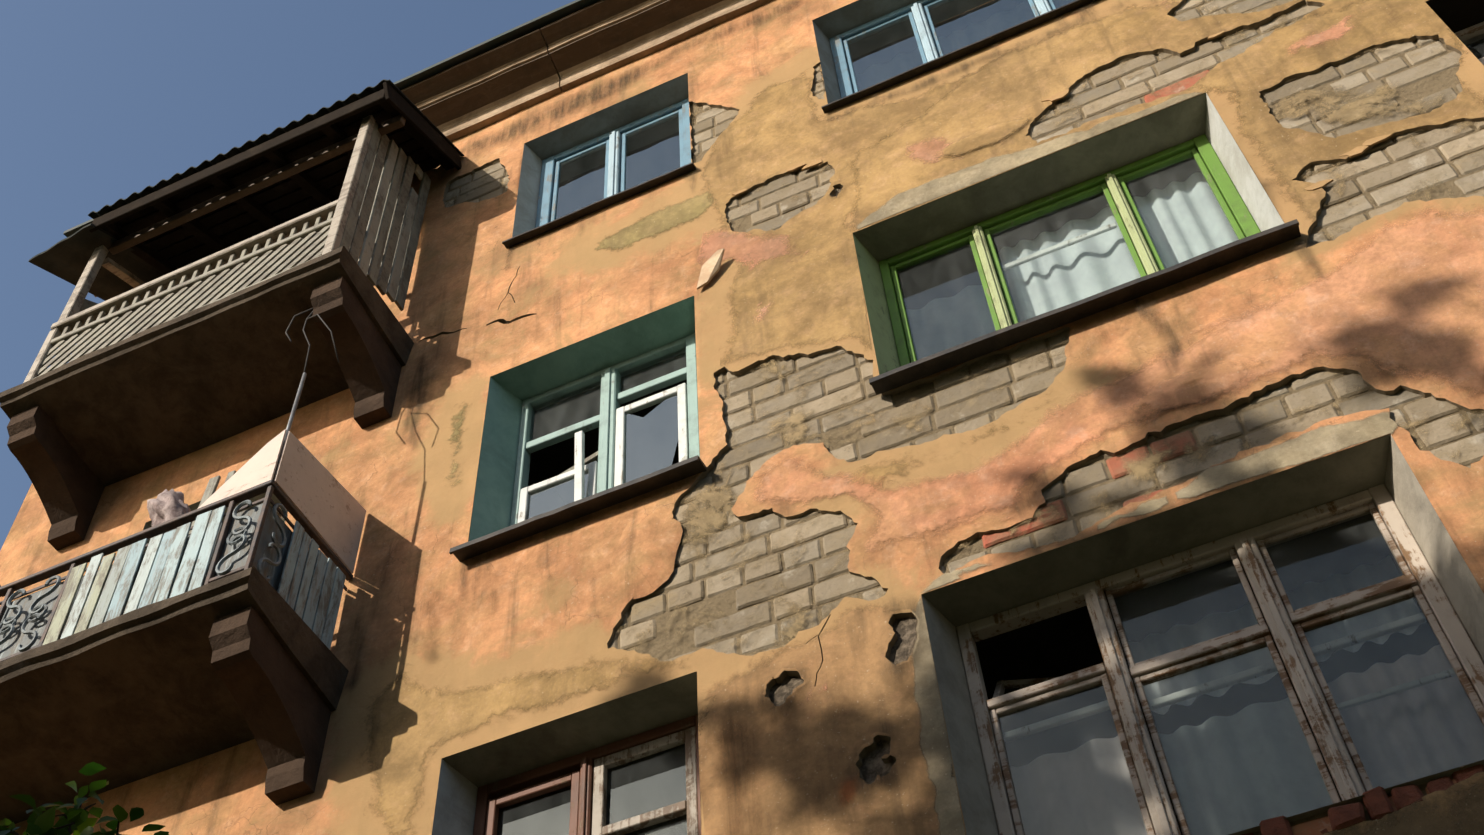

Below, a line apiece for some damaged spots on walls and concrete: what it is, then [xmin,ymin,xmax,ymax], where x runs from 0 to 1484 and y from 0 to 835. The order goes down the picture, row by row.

crack [419,266,536,342]
flaking render [361,0,1484,835]